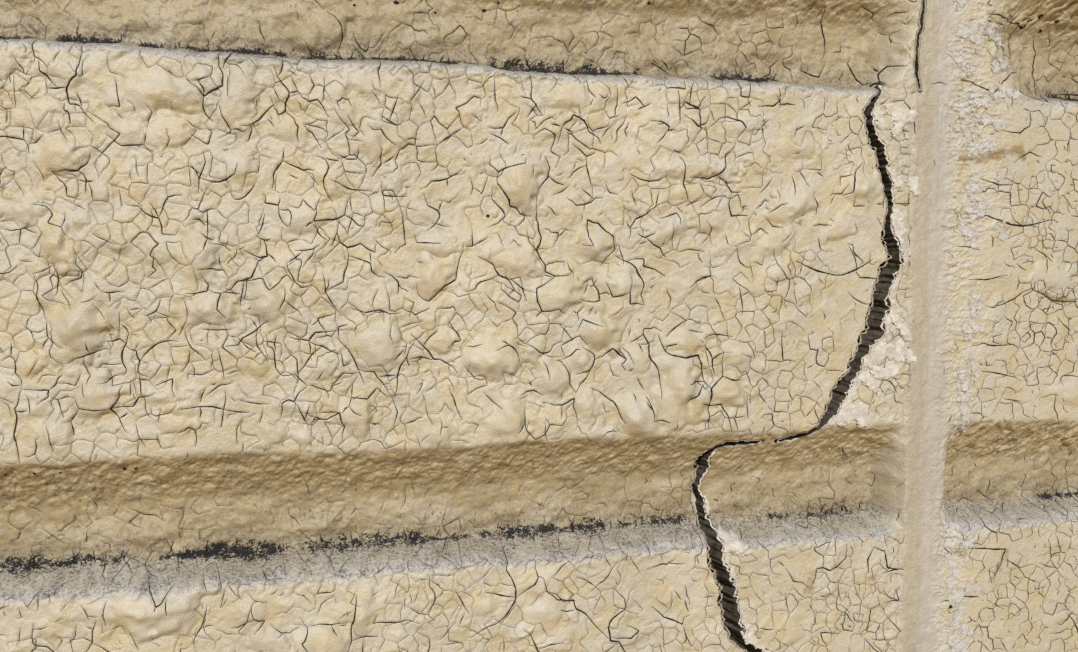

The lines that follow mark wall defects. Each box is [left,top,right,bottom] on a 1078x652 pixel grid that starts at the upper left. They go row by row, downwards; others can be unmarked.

crack [468,0,517,38]
crack [878,0,926,91]
crack [100,57,124,117]
crack [955,0,1078,421]
crack [634,379,678,432]
crack [852,362,911,417]
crack [1,498,180,652]
crack [111,498,232,545]
crack [196,556,247,608]
crack [277,584,336,615]
crack [288,511,354,582]
crack [795,470,875,532]